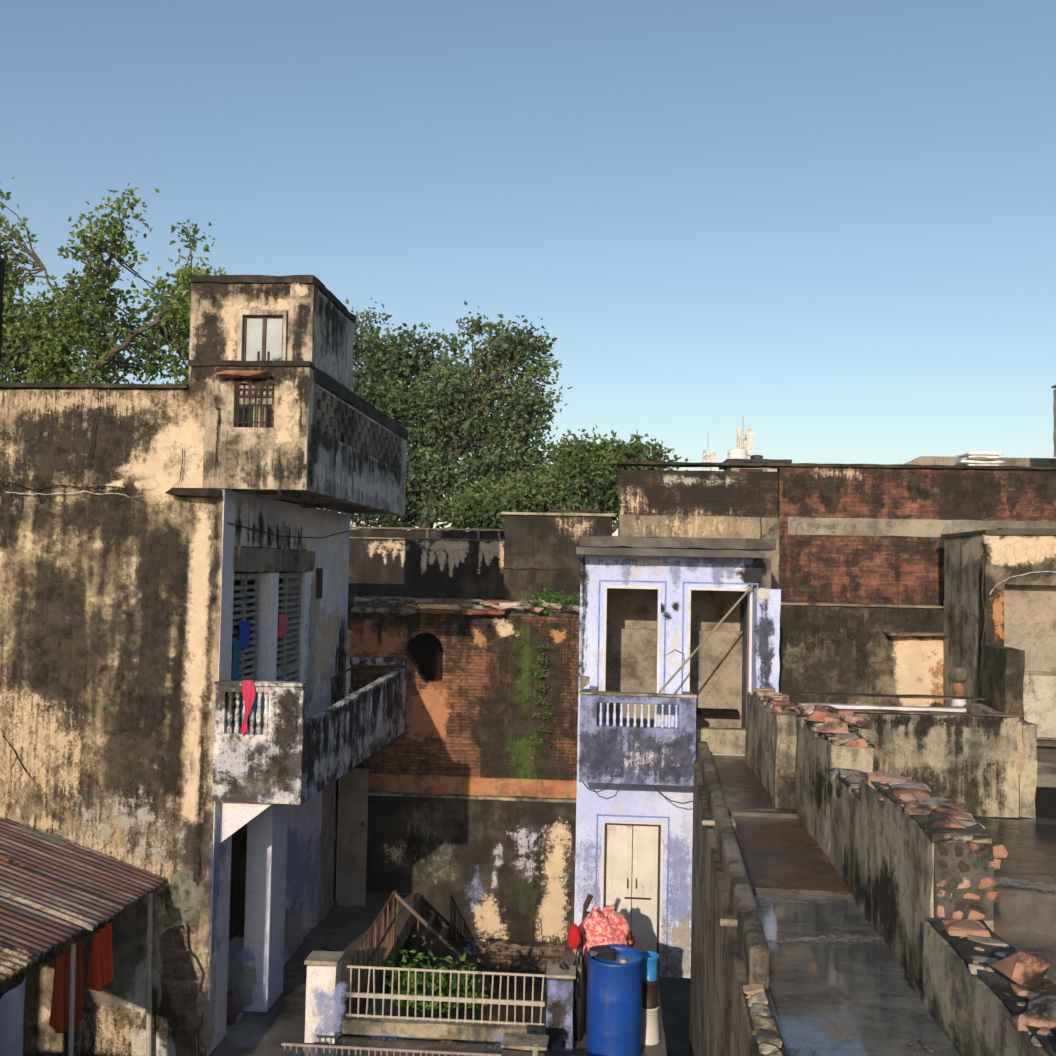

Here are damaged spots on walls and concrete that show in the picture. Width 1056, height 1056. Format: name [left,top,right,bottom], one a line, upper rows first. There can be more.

water stain [782,466,1056,533]
water stain [0,282,402,885]
peeling [368,538,504,577]
peeling [757,588,770,603]
water stain [753,536,944,688]
flaking render [990,593,1006,639]
water stain [230,556,698,797]
peeling [314,718,392,783]
water stain [871,674,1056,888]
rust [0,892,95,927]
flaking render [463,817,601,986]
rust [0,943,32,978]